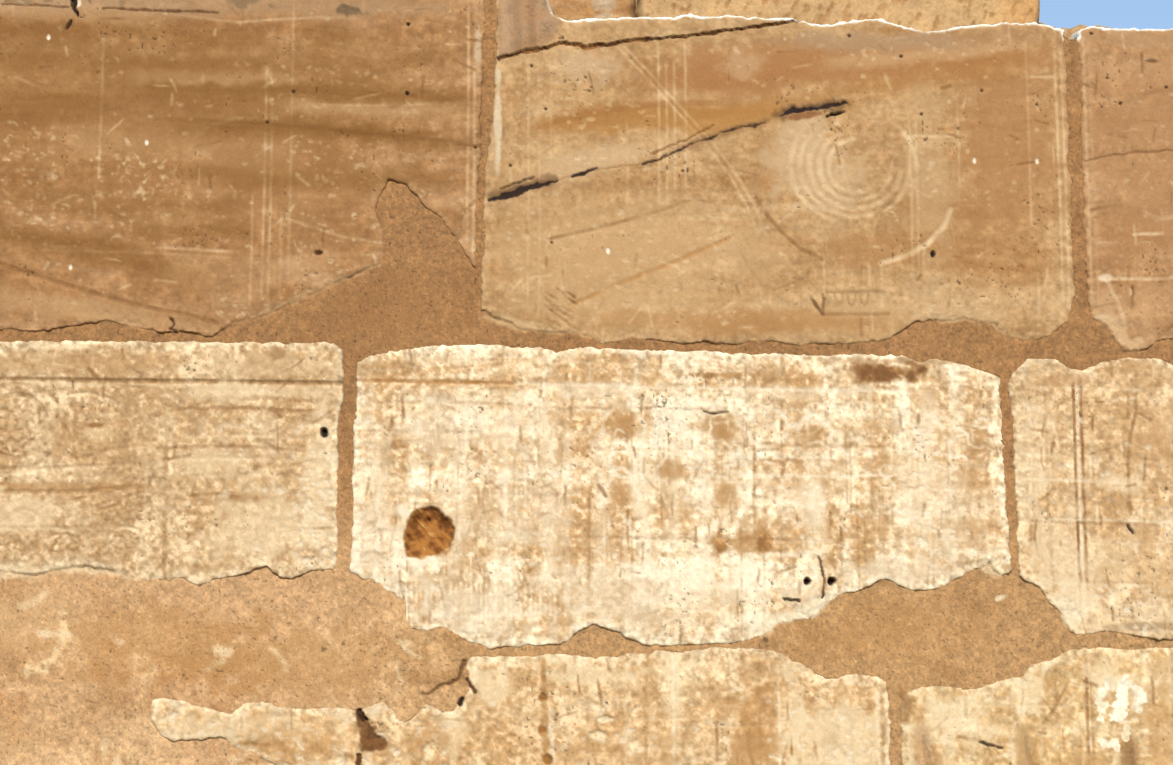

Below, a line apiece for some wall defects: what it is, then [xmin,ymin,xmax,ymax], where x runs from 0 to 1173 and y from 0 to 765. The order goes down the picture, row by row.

crack [0,0,220,30]
crack [496,19,802,61]
crack [486,95,852,203]
crack [1083,148,1173,164]
spalling [221,258,384,330]
spalling [751,593,837,641]
crack [420,658,477,707]
spalling [351,708,389,765]
damp [1011,719,1048,765]
damp [1094,673,1148,765]